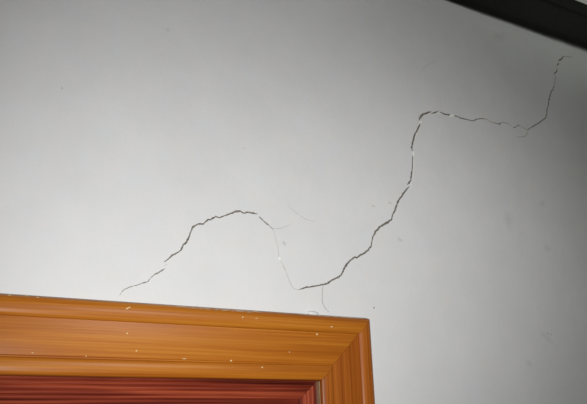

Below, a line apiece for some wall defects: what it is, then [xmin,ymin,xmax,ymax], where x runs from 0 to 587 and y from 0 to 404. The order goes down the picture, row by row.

crack [121,56,572,312]